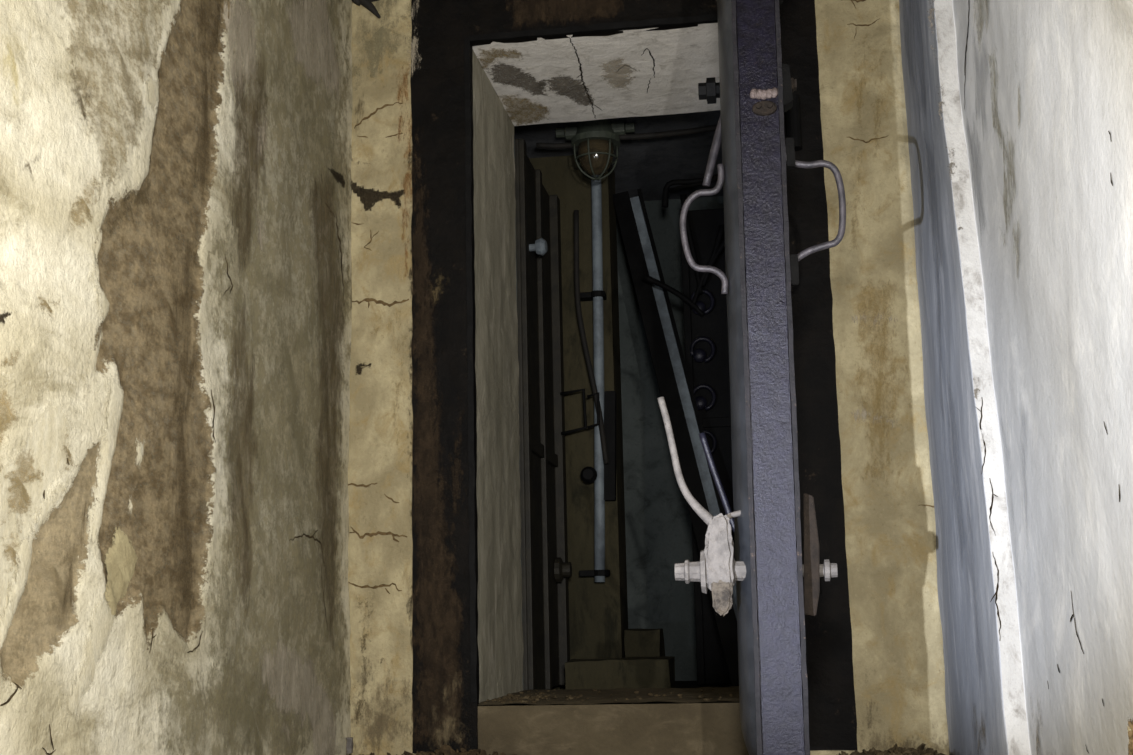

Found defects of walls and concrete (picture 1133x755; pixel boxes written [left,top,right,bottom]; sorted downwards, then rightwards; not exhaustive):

crack [354,102,403,138]
crack [570,38,601,116]
leakage [599,59,635,88]
crack [962,0,970,107]
crack [325,168,409,308]
leakage [0,392,16,444]
leakage [0,449,44,513]
spalling [0,0,233,720]
leakage [159,0,411,755]
rust [398,116,466,749]
crack [289,530,402,630]
crack [349,527,407,542]